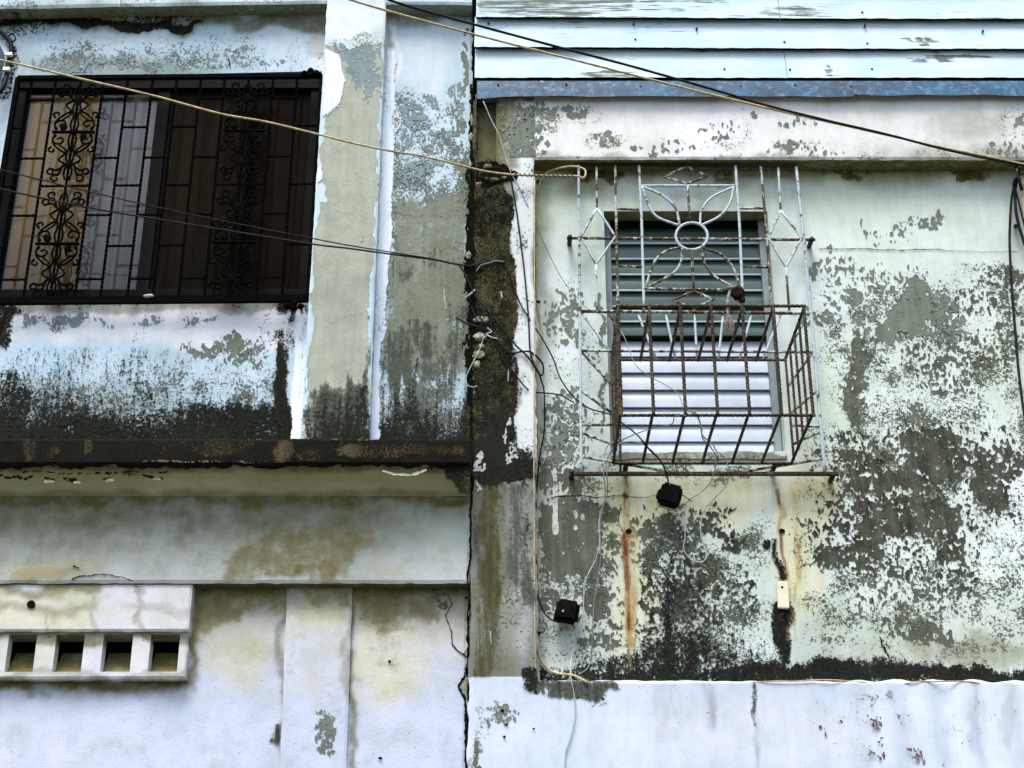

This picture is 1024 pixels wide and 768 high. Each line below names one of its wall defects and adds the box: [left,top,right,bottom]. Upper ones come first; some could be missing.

peeling [393,28,588,205]
peeling [302,41,383,439]
peeling [860,209,944,247]
peeling [180,330,267,373]
water stain [0,182,536,677]
crack [444,84,476,768]
peeling [779,244,1024,646]
corrosion [621,492,637,647]
mould [521,560,1024,725]
water stain [762,538,788,583]
corrosion [776,489,801,577]
peeling [315,710,336,756]